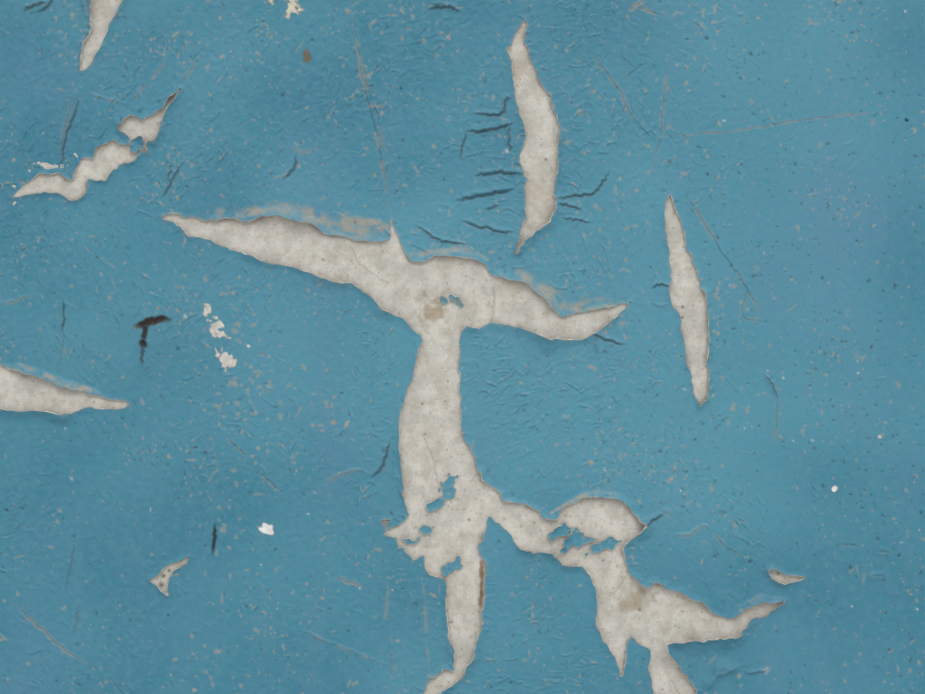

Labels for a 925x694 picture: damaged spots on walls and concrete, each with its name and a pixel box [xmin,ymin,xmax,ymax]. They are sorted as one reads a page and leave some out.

peeling [74,0,136,77]
peeling [8,82,189,210]
crack [413,93,519,248]
peeling [0,357,135,431]
peeling [158,9,813,694]
peeling [145,550,195,601]